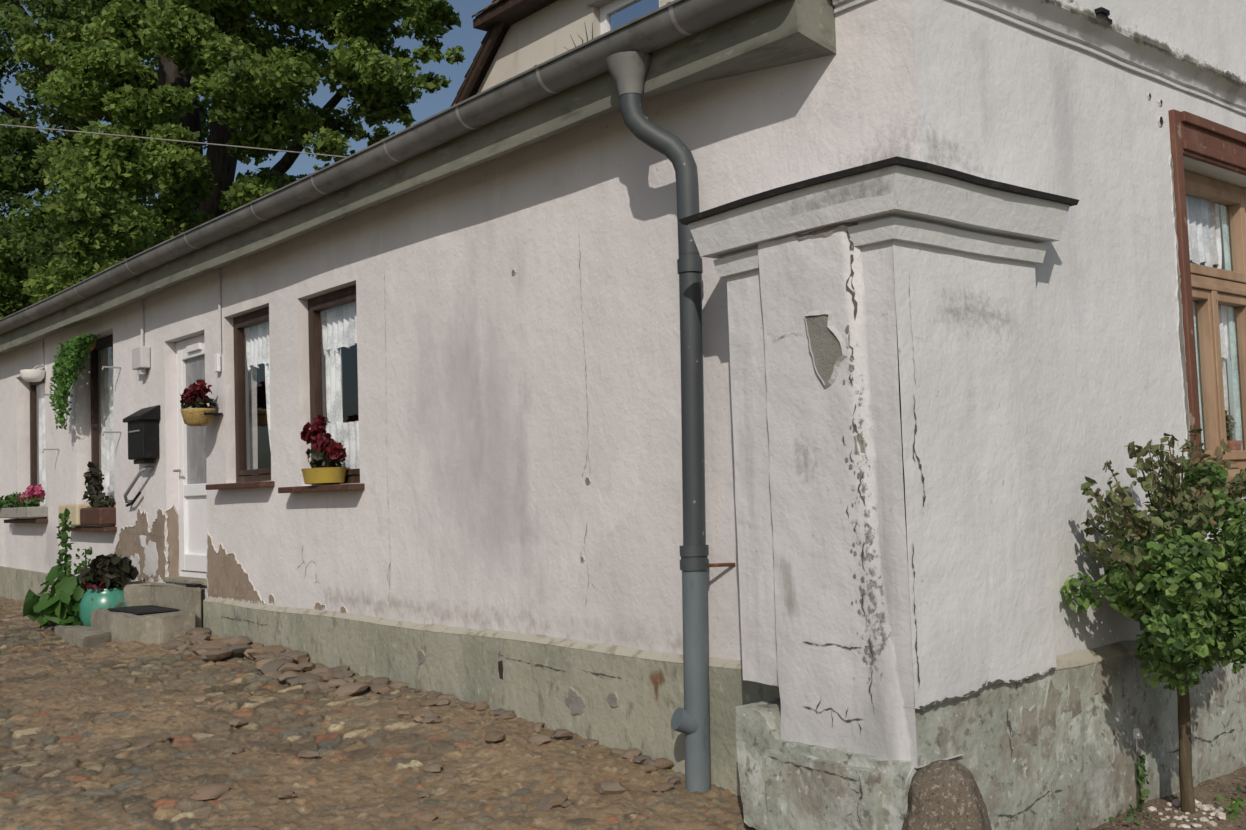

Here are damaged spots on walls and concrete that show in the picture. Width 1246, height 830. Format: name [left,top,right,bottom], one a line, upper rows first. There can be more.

flaking render [1147,92,1164,128]
flaking render [114,505,179,582]
flaking render [206,528,276,605]
flaking render [804,310,887,685]
crack [803,230,926,734]
crack [912,545,1056,757]